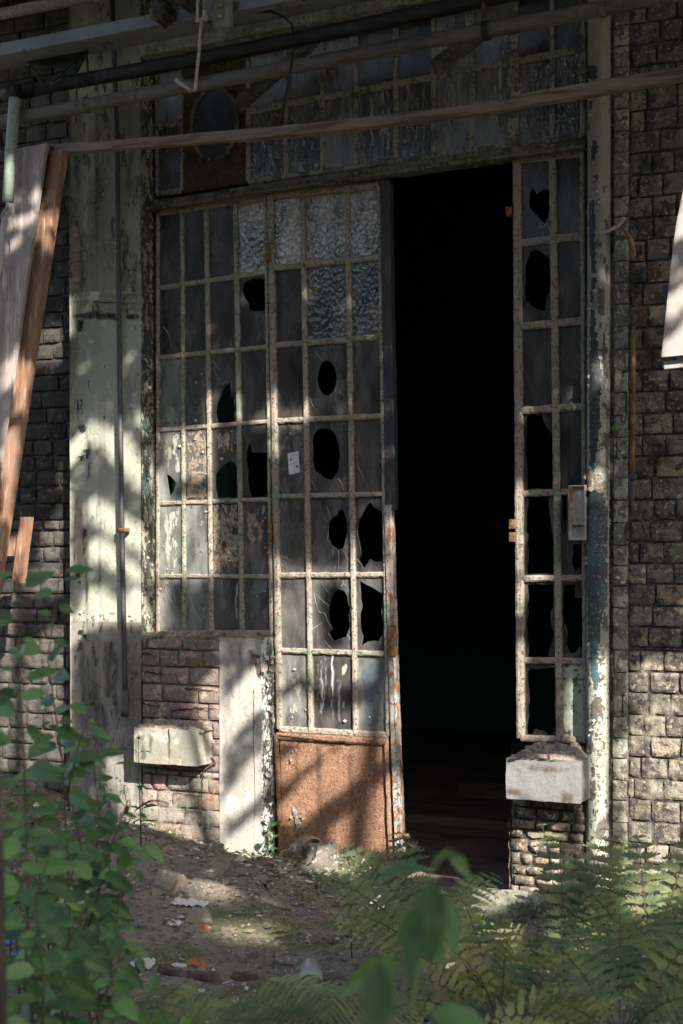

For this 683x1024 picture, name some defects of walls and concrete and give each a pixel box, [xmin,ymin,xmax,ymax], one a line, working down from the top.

peeling [251,654,297,847]
peeling [583,190,626,815]